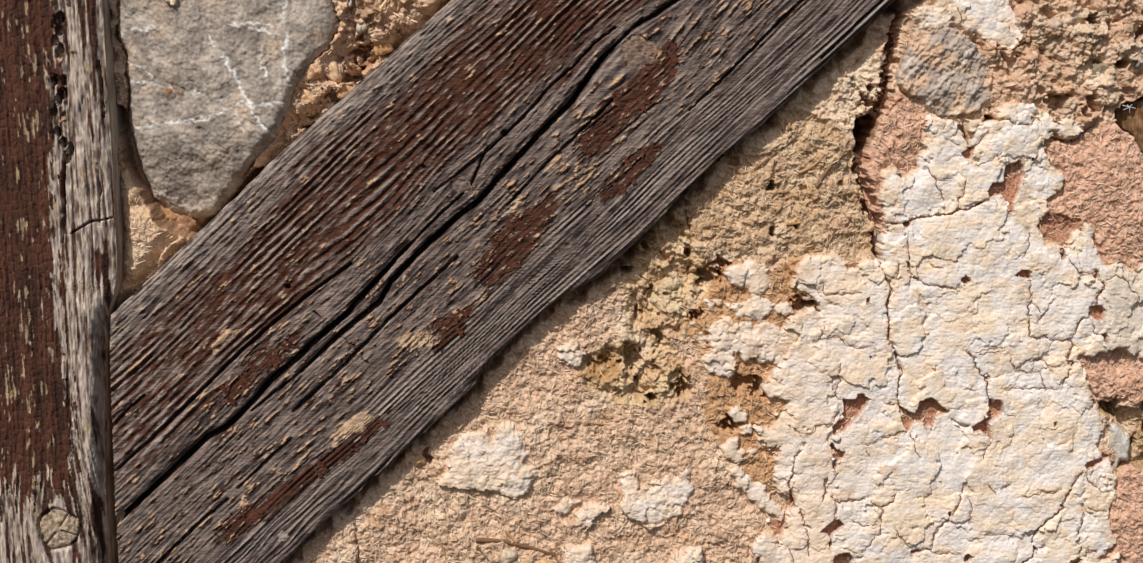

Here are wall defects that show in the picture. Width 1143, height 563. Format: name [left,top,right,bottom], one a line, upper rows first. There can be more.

crack [697,0,802,102]
crack [821,2,894,122]
crack [957,8,1031,51]
peeling [0,0,117,563]
crack [120,0,676,511]
crack [682,165,712,242]
flaking render [550,0,1143,563]
crack [788,117,1109,563]
crack [966,259,1140,416]
crack [157,504,220,563]